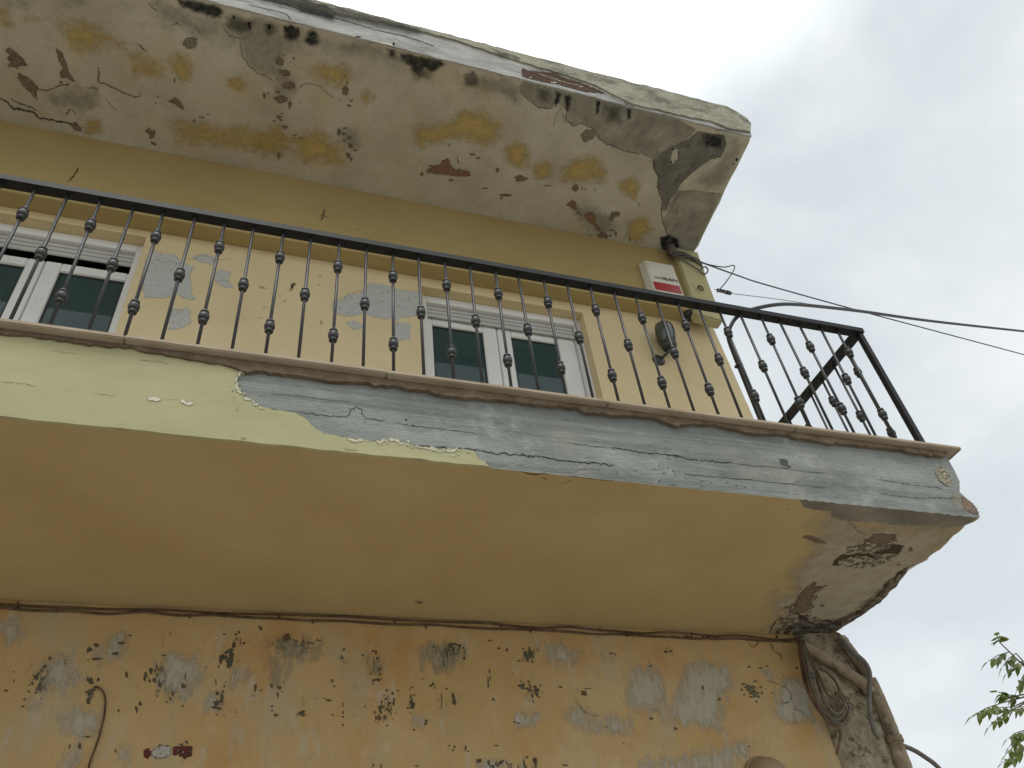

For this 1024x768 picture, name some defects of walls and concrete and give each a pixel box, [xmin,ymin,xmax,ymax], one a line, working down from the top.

peeling [4,47,75,99]
crack [0,98,82,132]
crack [85,67,141,112]
peeling [420,142,481,181]
damp [415,112,500,147]
flaking render [519,68,727,239]
peeling [142,251,233,330]
peeling [331,283,419,341]
crack [275,394,825,488]
spalling [229,371,979,659]
peeling [143,740,193,759]